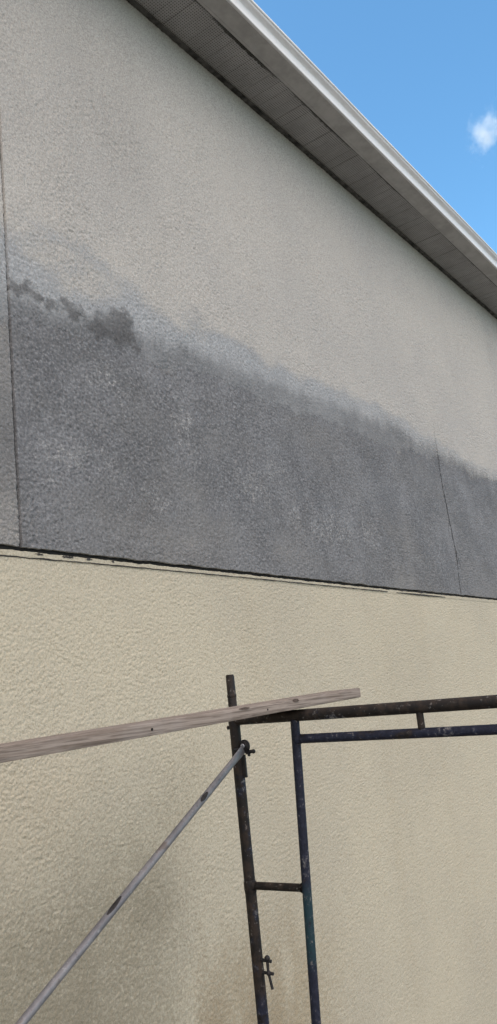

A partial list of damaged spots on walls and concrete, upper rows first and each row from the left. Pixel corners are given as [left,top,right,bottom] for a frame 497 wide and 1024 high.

water stain [214,19,272,73]
water stain [0,244,497,598]